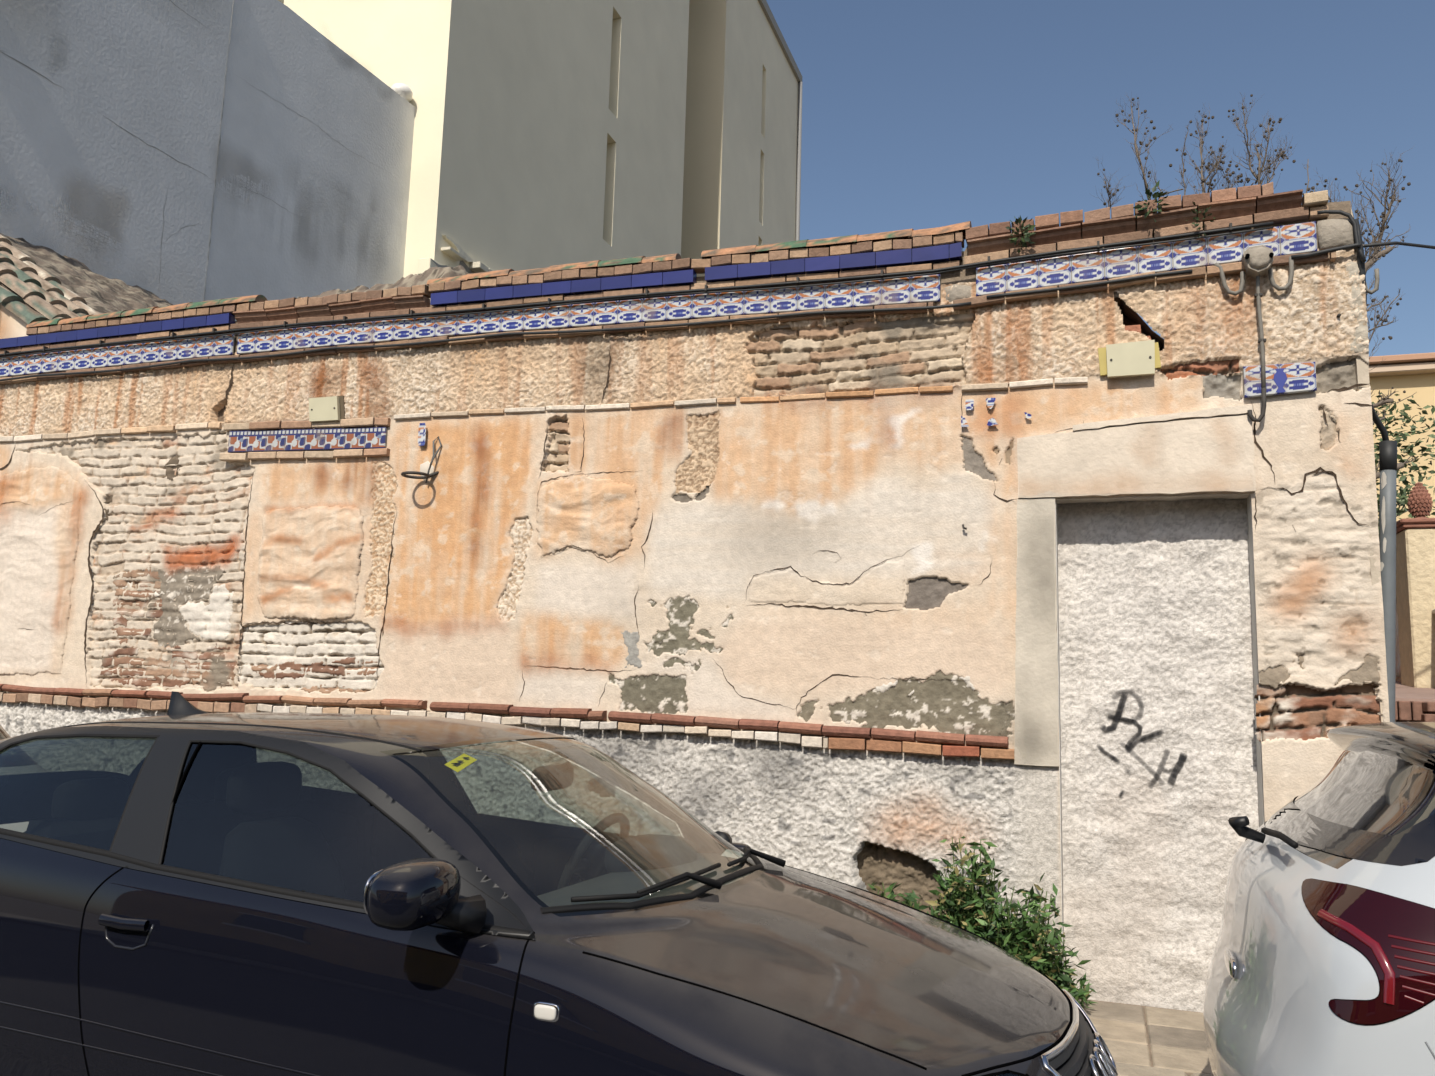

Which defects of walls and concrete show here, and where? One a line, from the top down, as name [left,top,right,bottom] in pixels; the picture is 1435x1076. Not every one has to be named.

crack [0,50,63,88]
crack [100,113,208,177]
flaking render [745,313,975,397]
spalling [961,436,1013,481]
crack [1252,383,1373,529]
flaking render [20,406,397,694]
crack [746,549,911,616]
spalling [905,577,968,610]
spalling [609,596,734,714]
peeling [798,671,1015,737]
flaking render [1254,655,1380,741]
spalling [857,841,947,915]